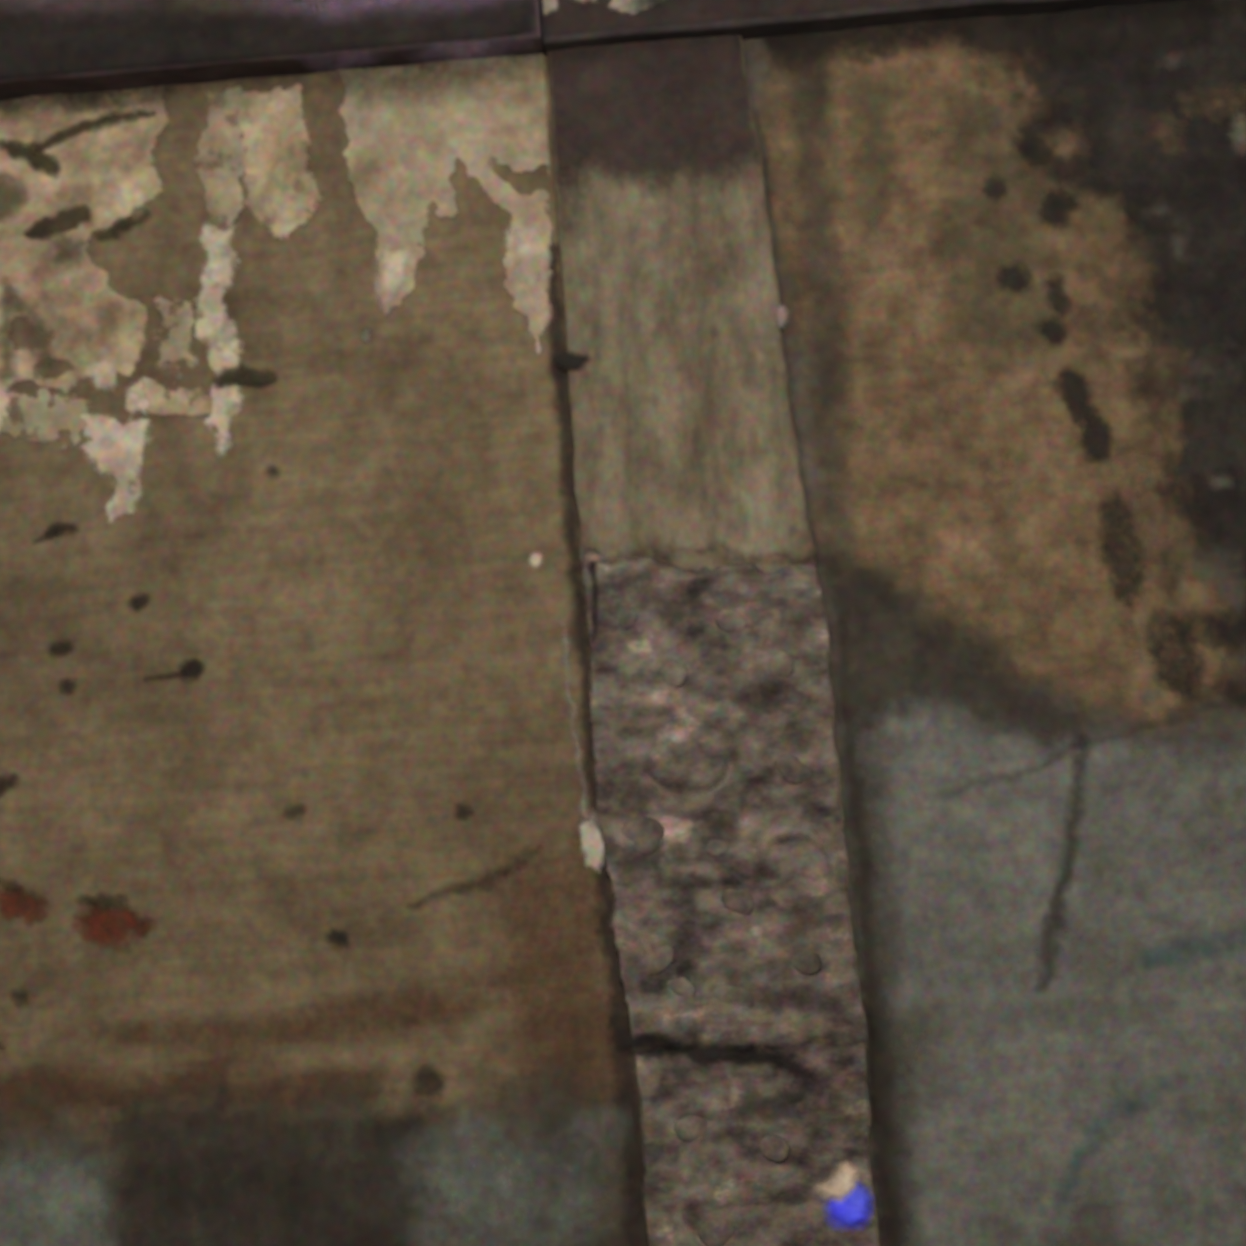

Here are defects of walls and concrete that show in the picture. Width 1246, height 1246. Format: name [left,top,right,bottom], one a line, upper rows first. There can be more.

peeling [542,0,558,14]
peeling [576,0,665,14]
water stain [547,0,914,34]
peeling [0,83,324,523]
peeling [337,53,553,355]
water stain [766,0,1246,565]
water stain [573,734,605,870]
crack [549,246,813,1246]
water stain [831,575,1246,1246]
crack [1044,775,1081,984]
water stain [0,1073,632,1246]